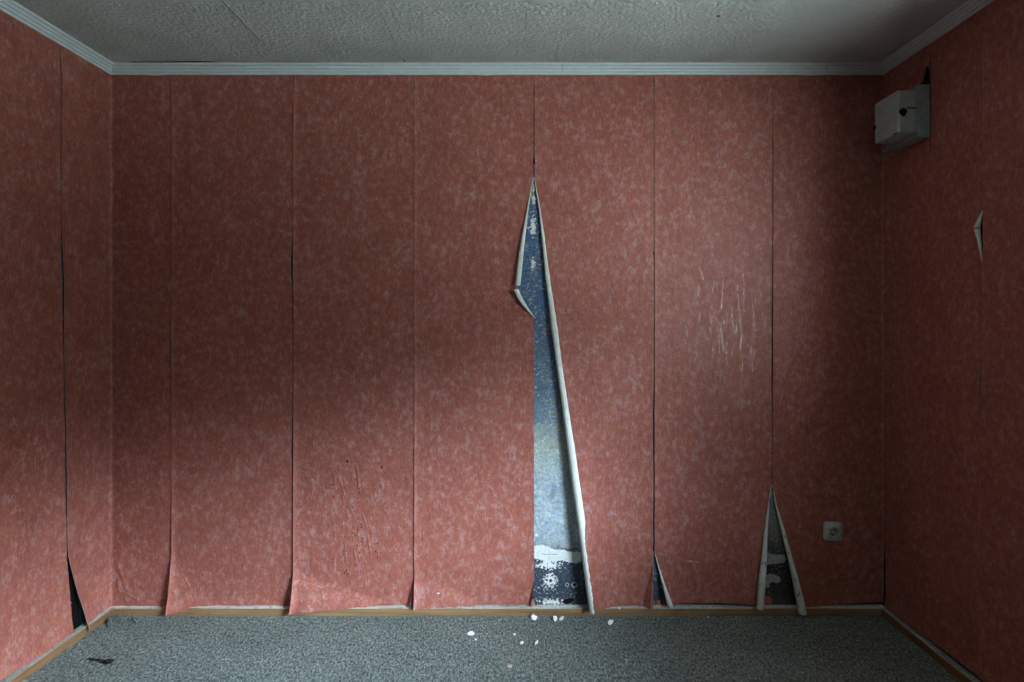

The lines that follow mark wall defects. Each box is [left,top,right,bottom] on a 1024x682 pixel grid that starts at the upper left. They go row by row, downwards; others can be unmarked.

flaking render [67,551,81,630]
flaking render [516,163,588,621]
flaking render [652,376,667,605]
flaking render [765,483,796,605]